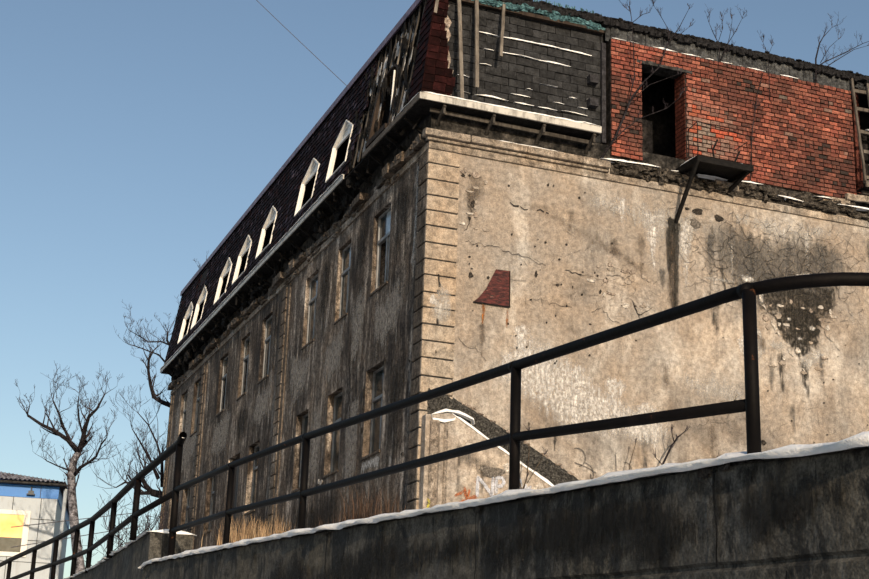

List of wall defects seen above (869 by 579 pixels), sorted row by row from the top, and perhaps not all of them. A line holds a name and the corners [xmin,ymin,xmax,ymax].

damp [603,199,696,308]
crack [465,197,868,351]
flaking render [685,207,703,229]
damp [707,215,843,290]
peeling [822,193,869,208]
damp [760,287,835,395]
damp [267,496,547,579]